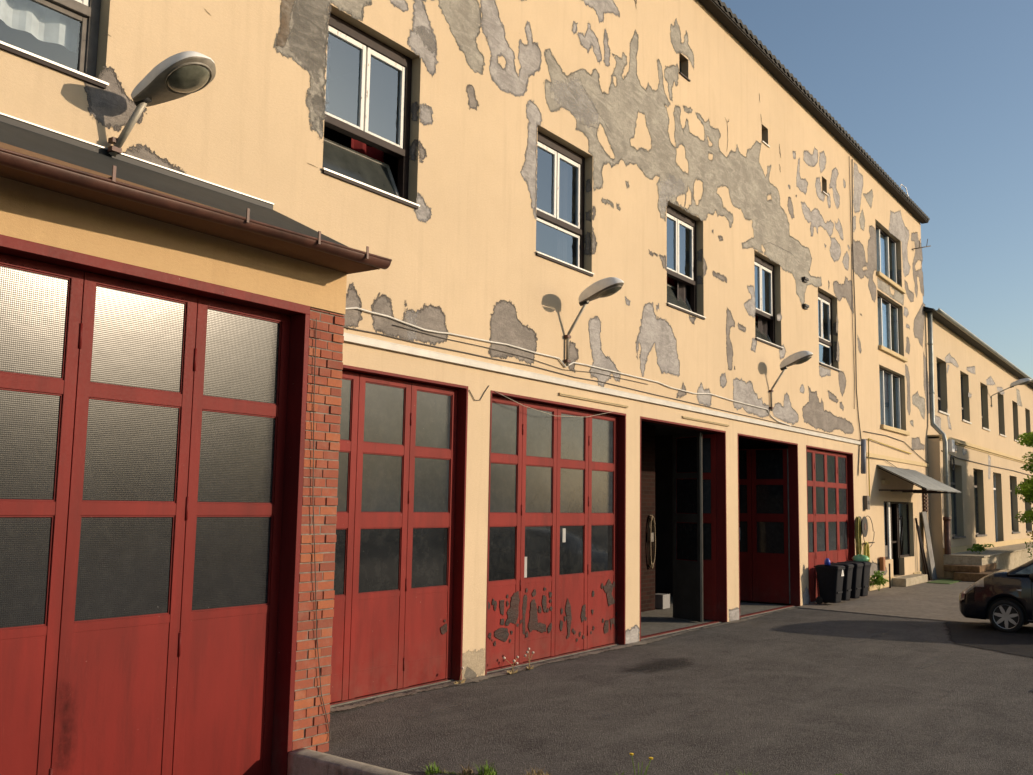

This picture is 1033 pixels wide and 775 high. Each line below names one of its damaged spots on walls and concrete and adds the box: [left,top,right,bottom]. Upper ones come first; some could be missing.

flaking render [84,66,147,132]
flaking render [273,0,372,139]
flaking render [122,143,187,174]
flaking render [390,0,952,451]
flaking render [344,282,448,346]
peeling [488,579,617,646]